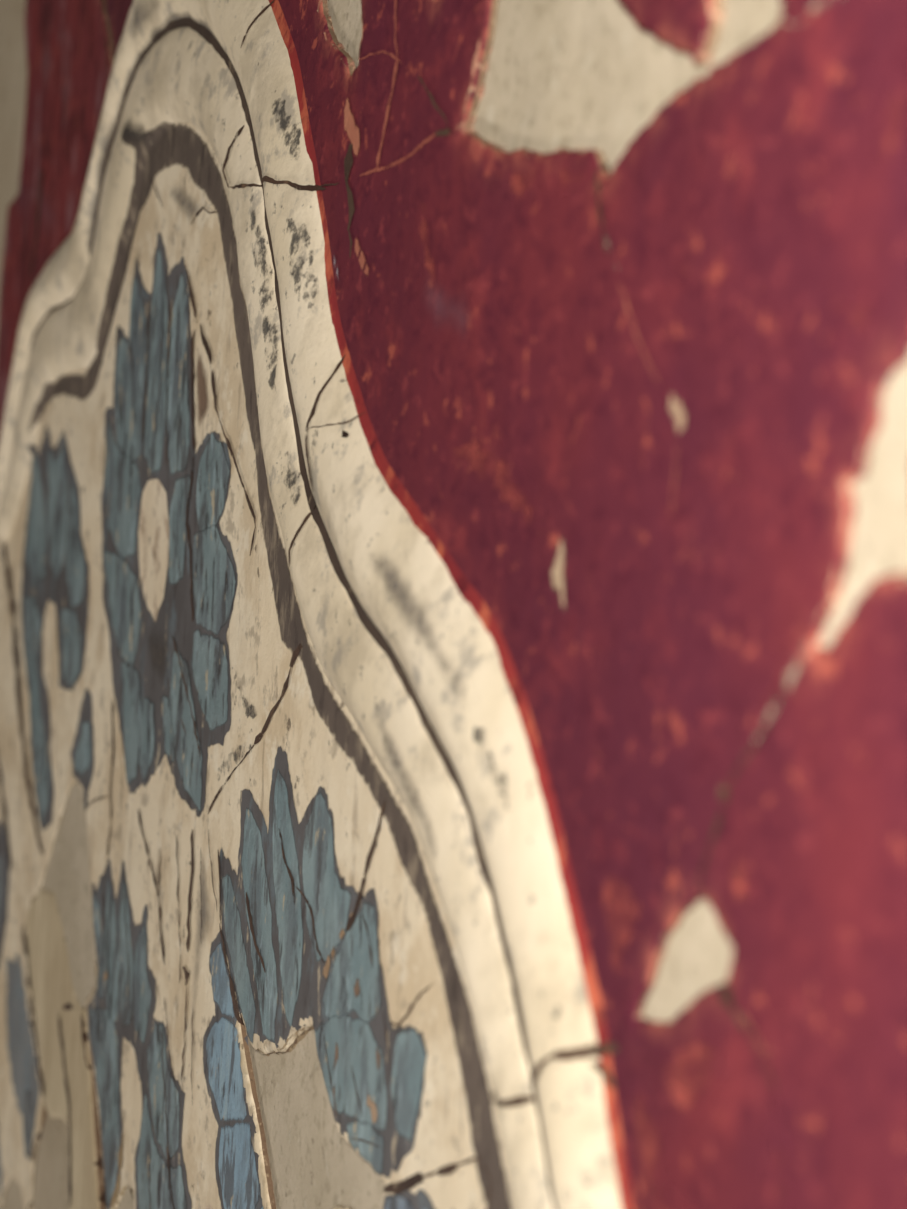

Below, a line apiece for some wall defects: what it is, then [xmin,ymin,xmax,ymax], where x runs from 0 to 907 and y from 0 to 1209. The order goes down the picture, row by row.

crack [191,0,450,258]
flaking render [317,0,363,71]
flaking render [456,0,782,173]
crack [130,264,256,755]
crack [288,355,366,564]
flaking render [816,363,907,647]
flaking render [42,783,97,1009]
crack [84,644,302,1209]
flaking render [635,898,734,1025]
flaking render [245,1027,385,1209]
crack [384,1157,491,1209]
crack [492,1042,619,1107]